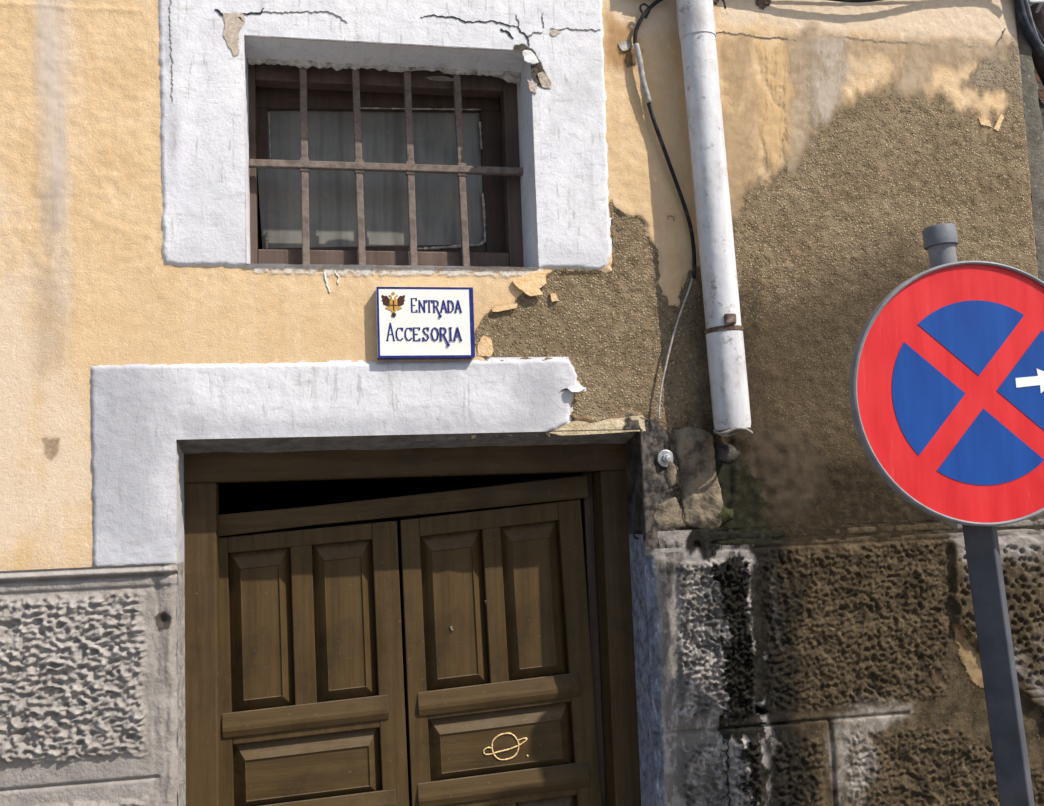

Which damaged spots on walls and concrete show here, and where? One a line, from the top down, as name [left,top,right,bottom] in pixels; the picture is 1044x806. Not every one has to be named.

crack [262,11,345,21]
crack [422,14,601,46]
spalling [475,39,1038,585]
spalling [155,611,172,631]
damp [687,437,963,806]